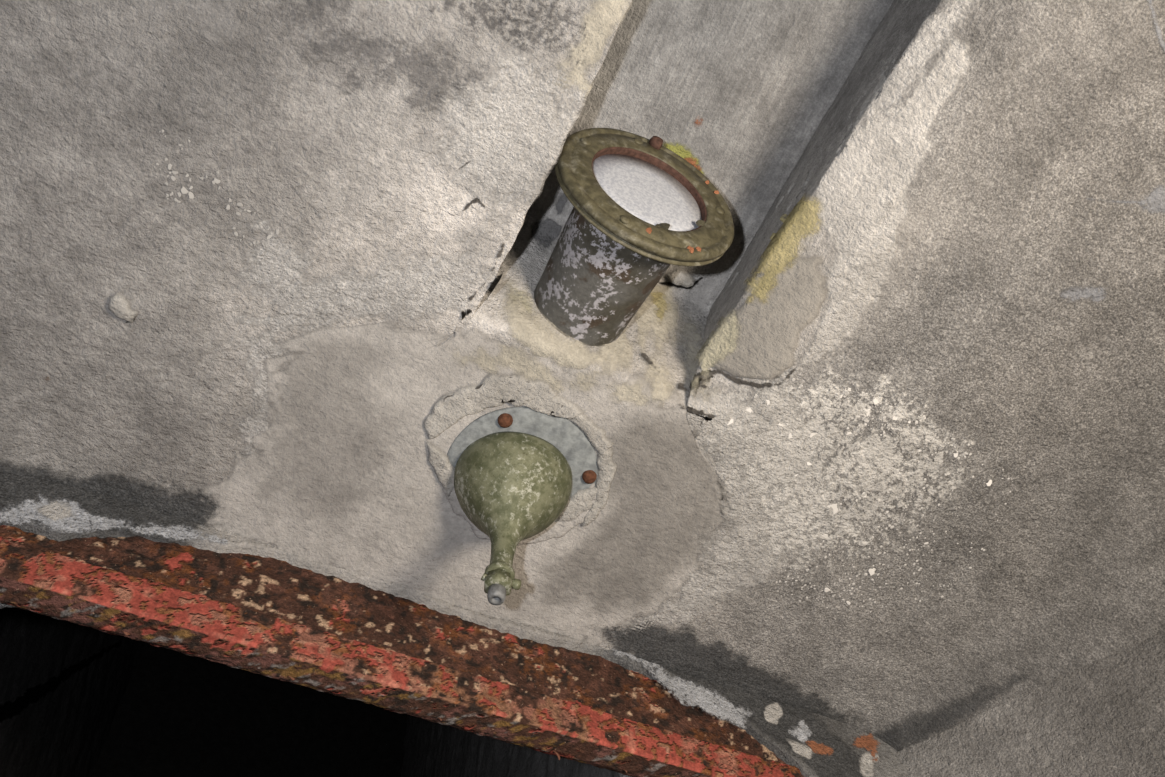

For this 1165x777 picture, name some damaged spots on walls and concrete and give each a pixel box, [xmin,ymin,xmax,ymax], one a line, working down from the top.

crack [463,198,485,211]
crack [461,243,504,320]
water stain [462,0,979,777]
water stain [0,462,229,545]
rust [807,741,833,755]
rust [853,733,879,777]
water stain [876,676,1022,751]